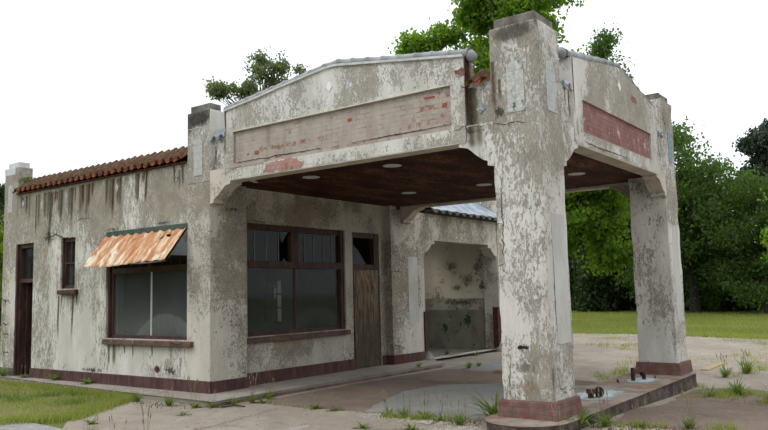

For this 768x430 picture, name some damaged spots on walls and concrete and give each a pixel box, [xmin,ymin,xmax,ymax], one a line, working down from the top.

crack [352,121,524,143]
flaking render [229,150,303,173]
leakage [106,177,121,211]
leakage [45,187,76,244]
corrosion [82,228,186,268]